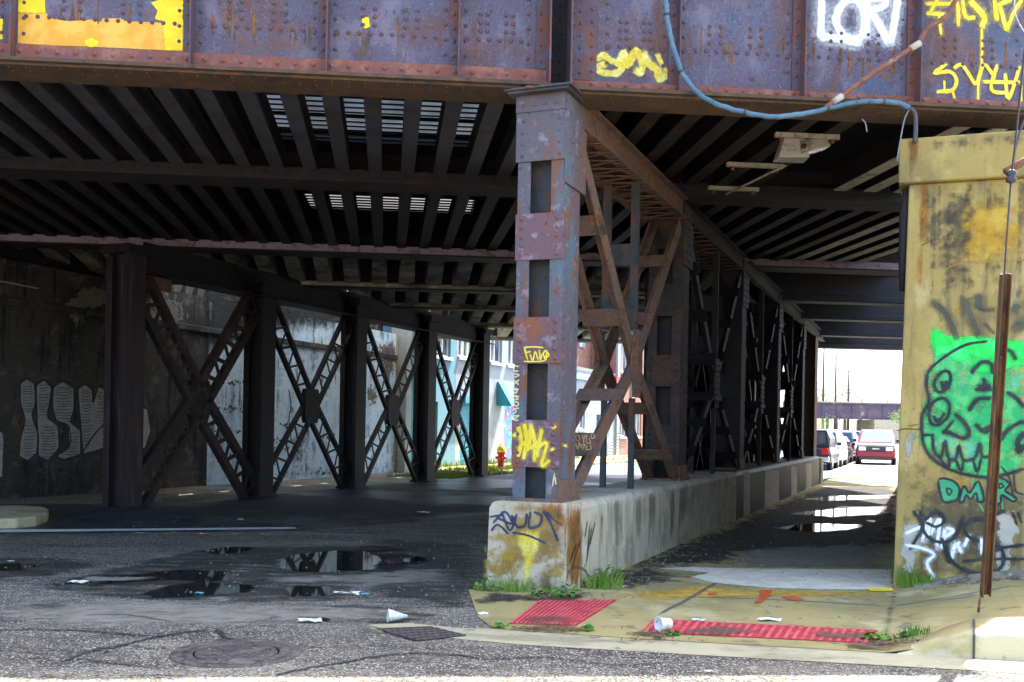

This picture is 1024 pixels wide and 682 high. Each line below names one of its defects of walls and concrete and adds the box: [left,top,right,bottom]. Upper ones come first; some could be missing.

rust [360,17,370,61]
leakage [927,197,974,282]
leakage [765,463,812,507]